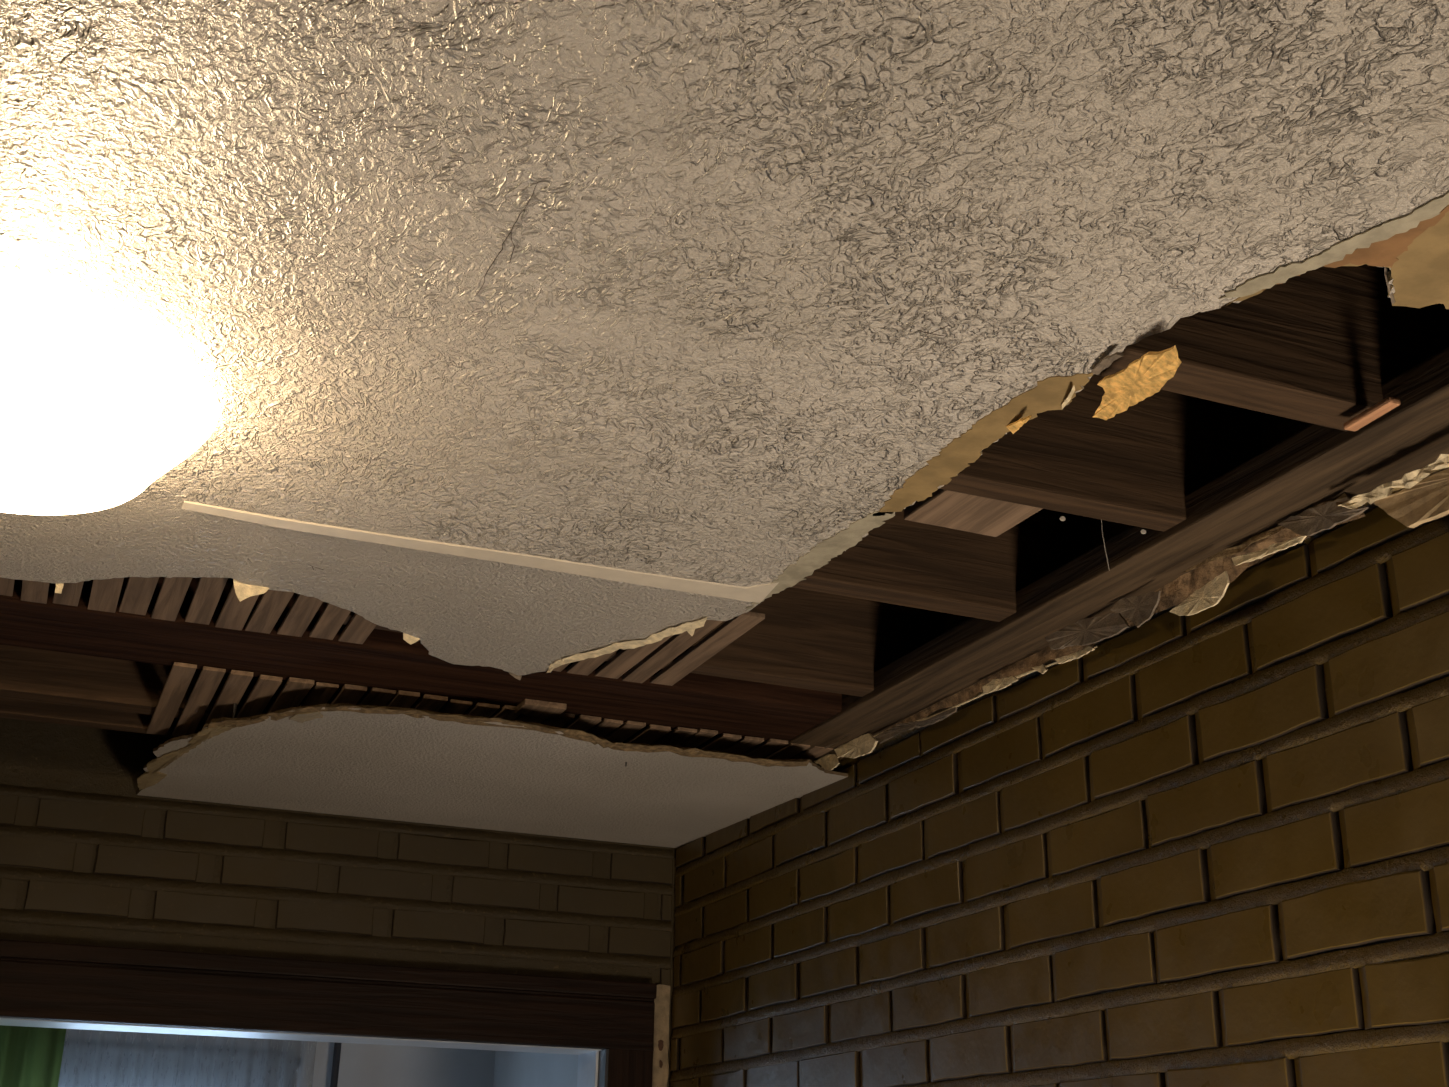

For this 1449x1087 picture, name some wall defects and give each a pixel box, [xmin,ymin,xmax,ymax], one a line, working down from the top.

flaking render [1219,191,1449,310]
flaking render [745,345,1181,611]
peeling [137,454,1449,790]